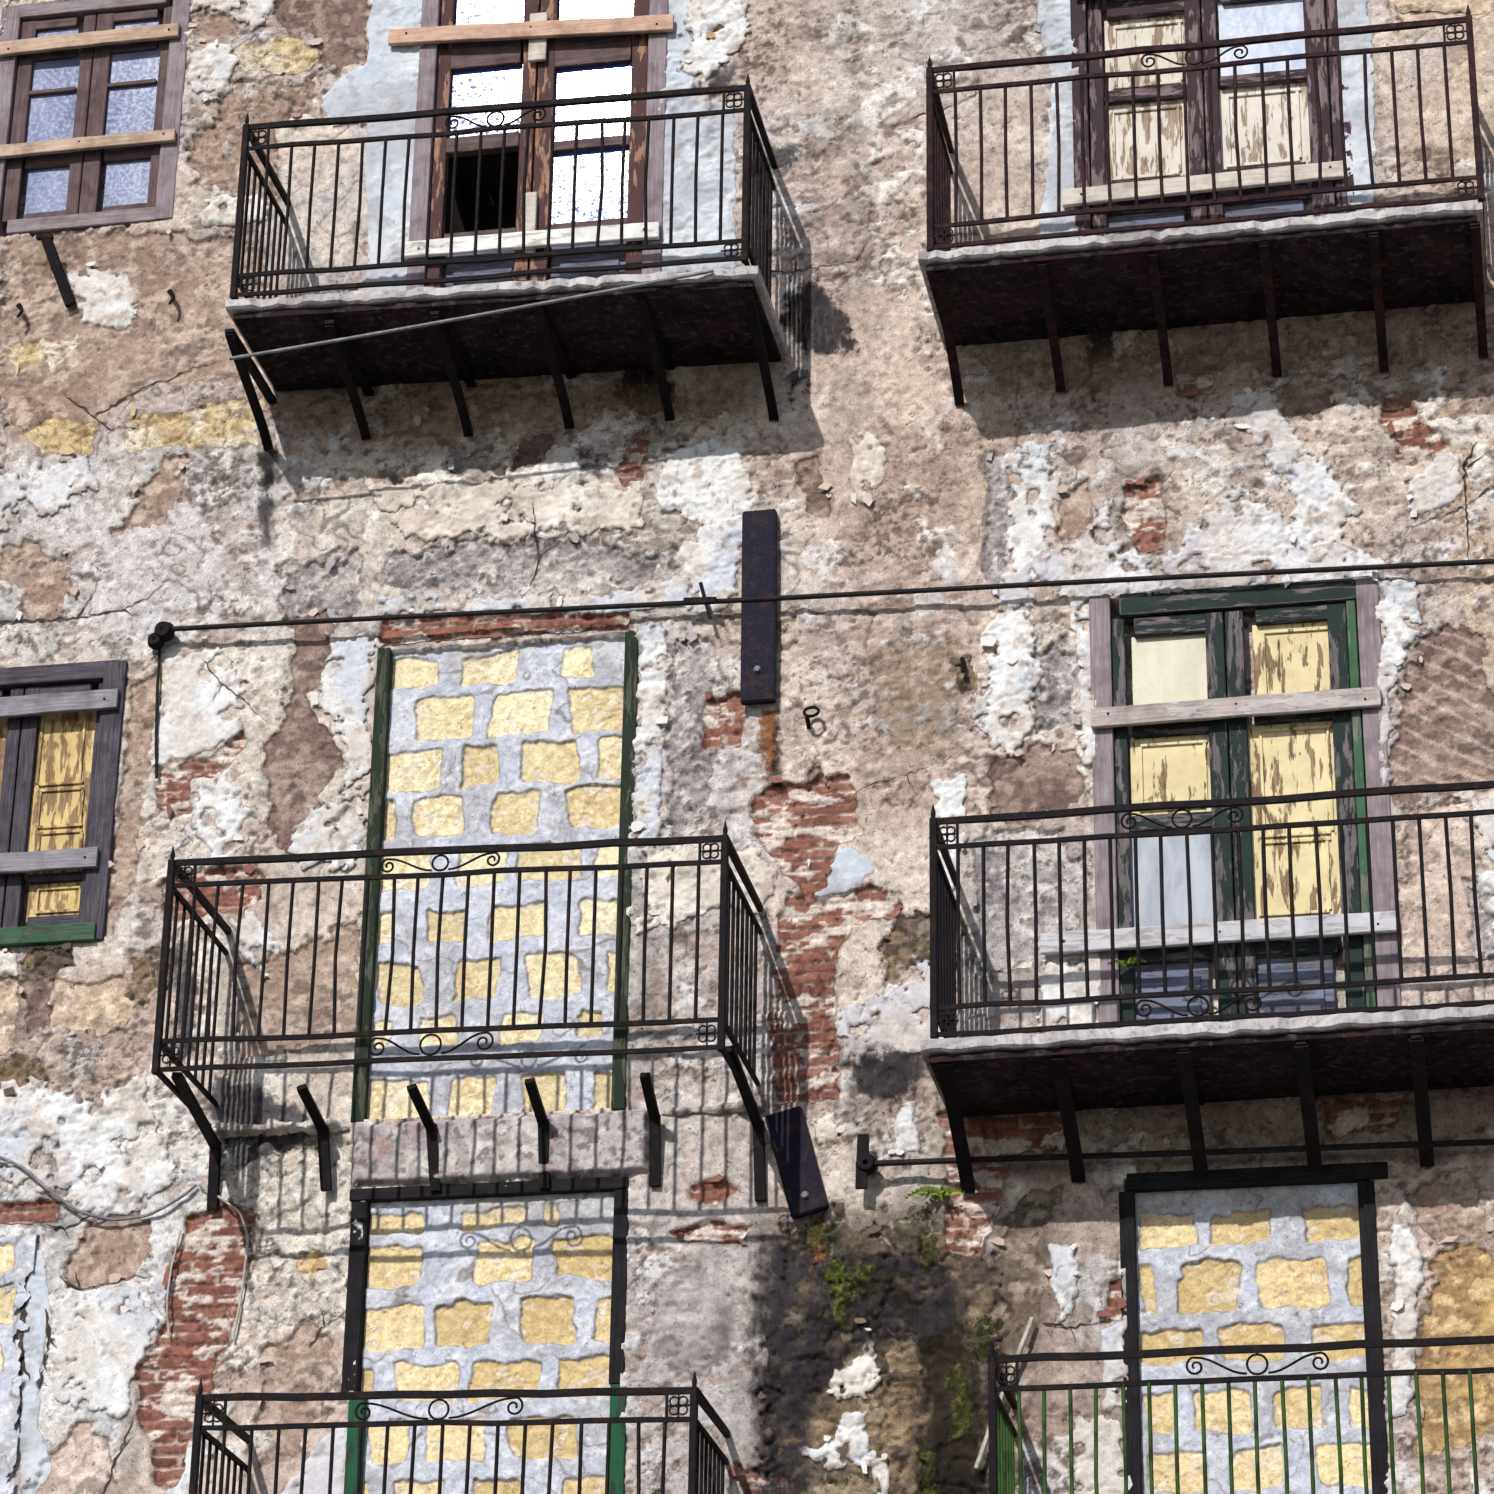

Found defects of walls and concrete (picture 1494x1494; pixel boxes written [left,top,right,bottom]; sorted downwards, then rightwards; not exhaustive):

crack [65,361,217,430]
flaking render [105,428,943,1145]
peeling [930,365,1494,1033]
flaking render [0,942,361,1494]
flaking render [669,1174,751,1244]
spalling [728,1110,1080,1494]
leakage [914,1323,988,1494]
peeling [1384,1168,1494,1494]